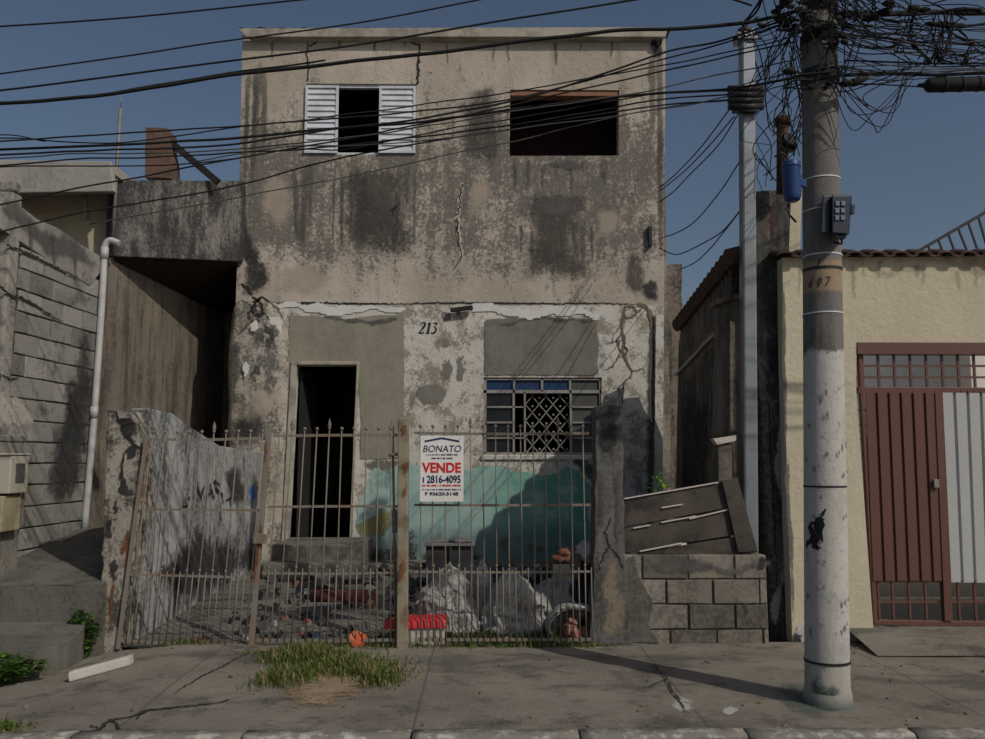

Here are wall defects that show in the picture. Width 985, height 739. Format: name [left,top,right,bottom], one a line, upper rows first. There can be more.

water stain [294,167,313,240]
water stain [332,170,417,251]
water stain [513,159,594,276]
water stain [244,219,268,293]
crack [240,182,644,406]
spalling [416,356,466,404]
water stain [49,333,92,501]
spalling [119,418,137,458]
spalling [105,472,134,538]
spalling [109,535,129,582]
crack [597,518,624,571]